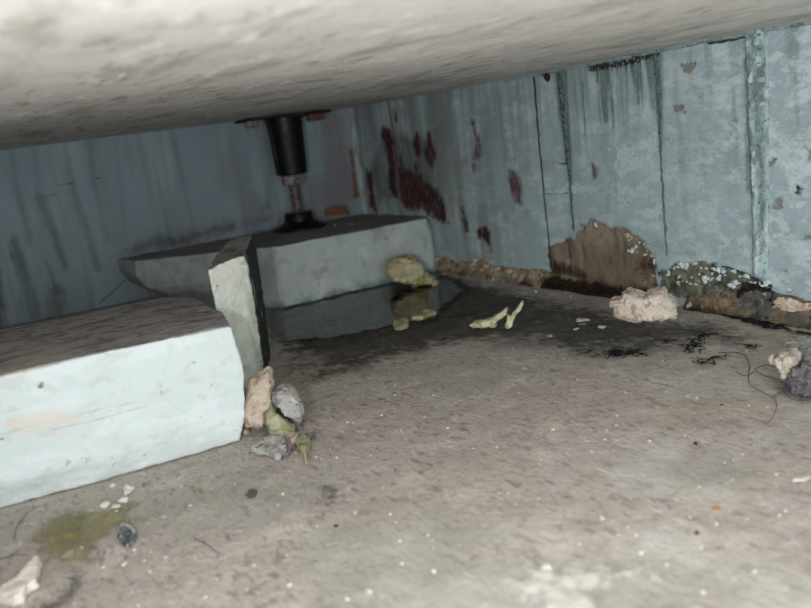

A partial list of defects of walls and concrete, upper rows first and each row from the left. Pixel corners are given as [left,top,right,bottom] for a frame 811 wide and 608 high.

corrosion [349,149,378,213]
water stain [556,71,575,231]
water stain [588,53,668,256]
peeling [469,300,524,329]
water stain [284,273,762,379]
flaking render [435,218,657,291]
water stain [658,261,774,302]
flaking render [683,289,811,330]
water stain [35,505,132,560]